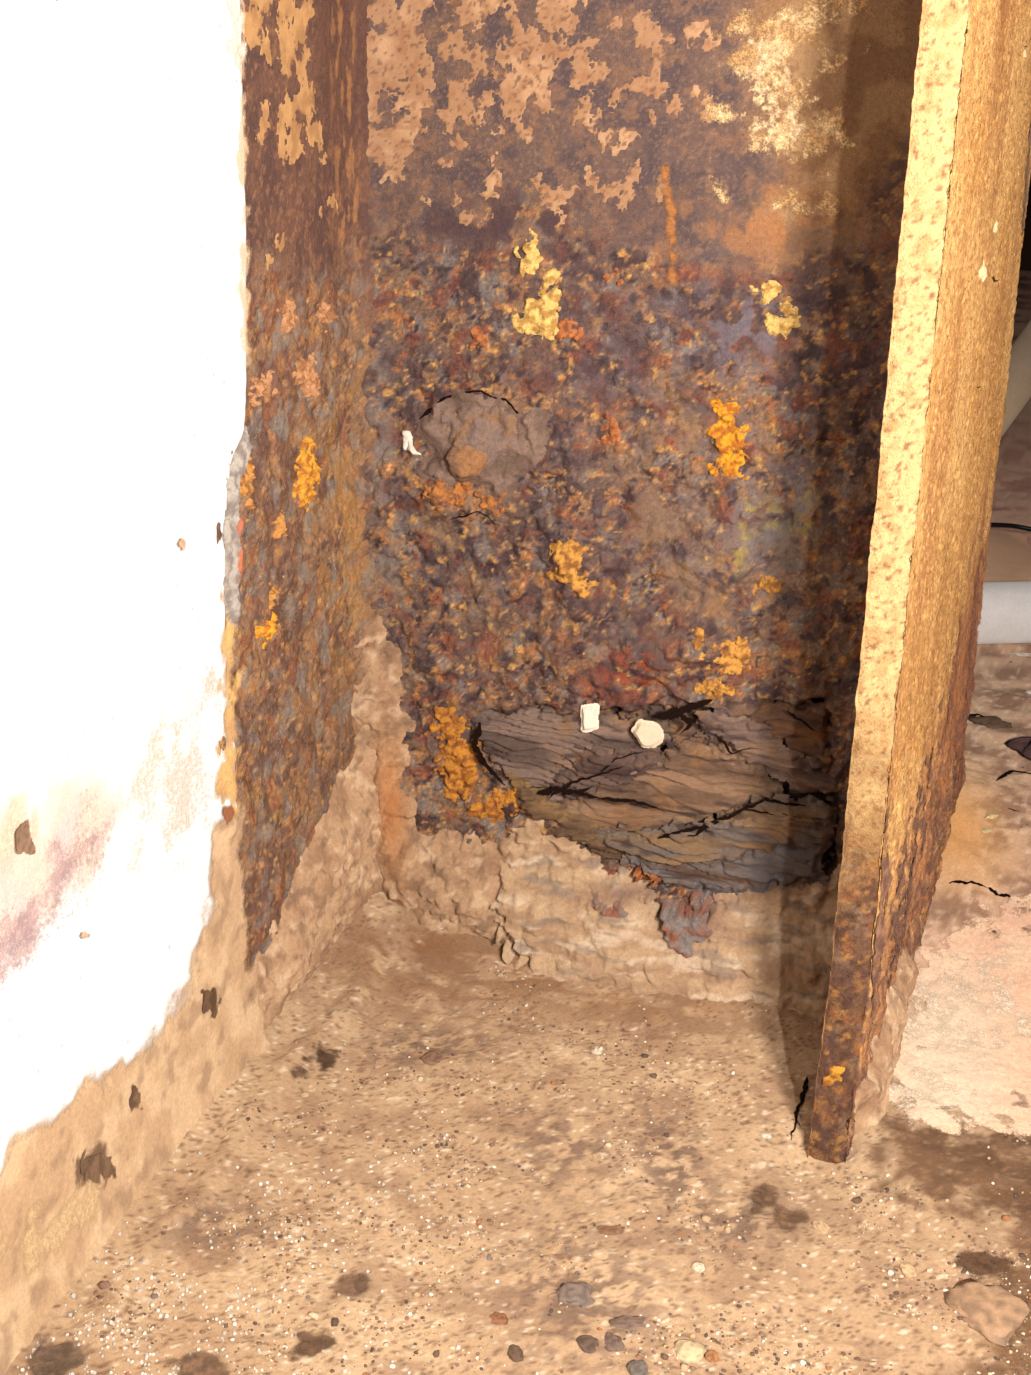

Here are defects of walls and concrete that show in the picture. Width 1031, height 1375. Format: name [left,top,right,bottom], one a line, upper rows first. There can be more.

rust [511,228,583,342]
rust [415,387,550,518]
rust [704,389,751,481]
spalling [16,820,36,855]
crack [471,722,505,785]
peeling [580,703,600,733]
rust [429,626,840,896]
peeling [631,719,664,748]
crack [538,750,806,839]
crack [658,699,758,754]
water stain [0,667,272,1375]
water stain [291,1331,336,1361]